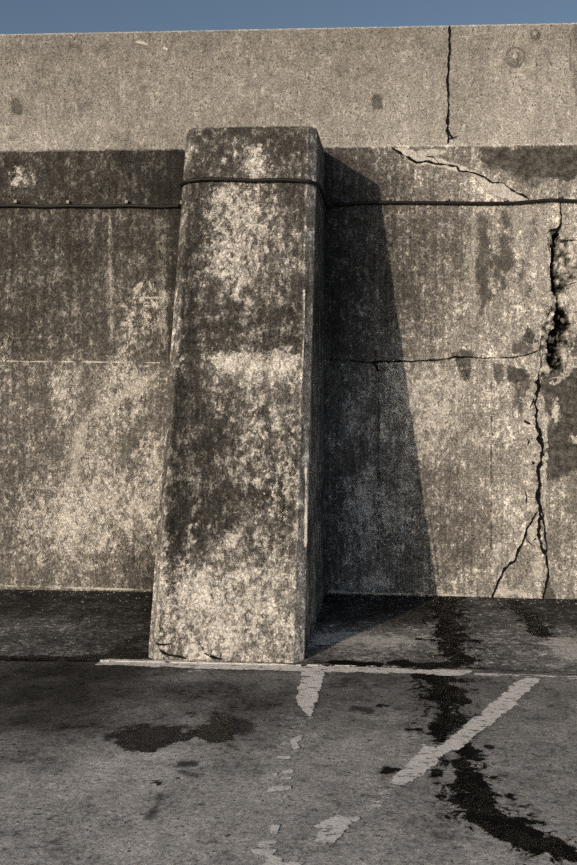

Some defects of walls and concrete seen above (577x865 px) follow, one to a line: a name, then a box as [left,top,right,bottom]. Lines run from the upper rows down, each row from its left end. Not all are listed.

crack [391,26,529,201]
crack [328,346,538,560]
damp [378,204,577,481]
crack [439,377,577,600]
spalling [517,228,577,512]
damp [539,634,577,664]